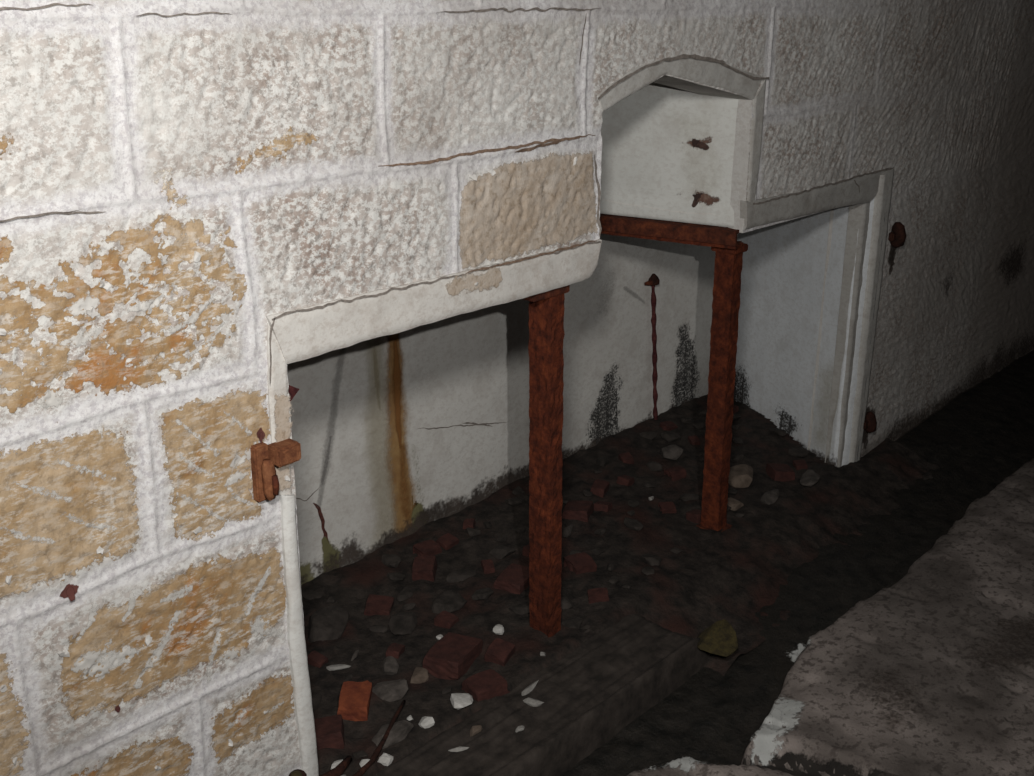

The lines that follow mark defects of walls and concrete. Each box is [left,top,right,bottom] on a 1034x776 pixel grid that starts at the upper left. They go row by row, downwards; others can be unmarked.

peeling [0,169,247,413]
peeling [446,151,598,296]
rust [888,245,896,274]
peeling [0,426,142,598]
peeling [159,388,292,541]
crack [296,488,329,542]
rust [388,333,415,533]
damp [313,465,529,574]
damp [562,365,624,459]
damp [671,324,700,408]
peeling [57,547,286,720]
peeling [208,673,294,764]